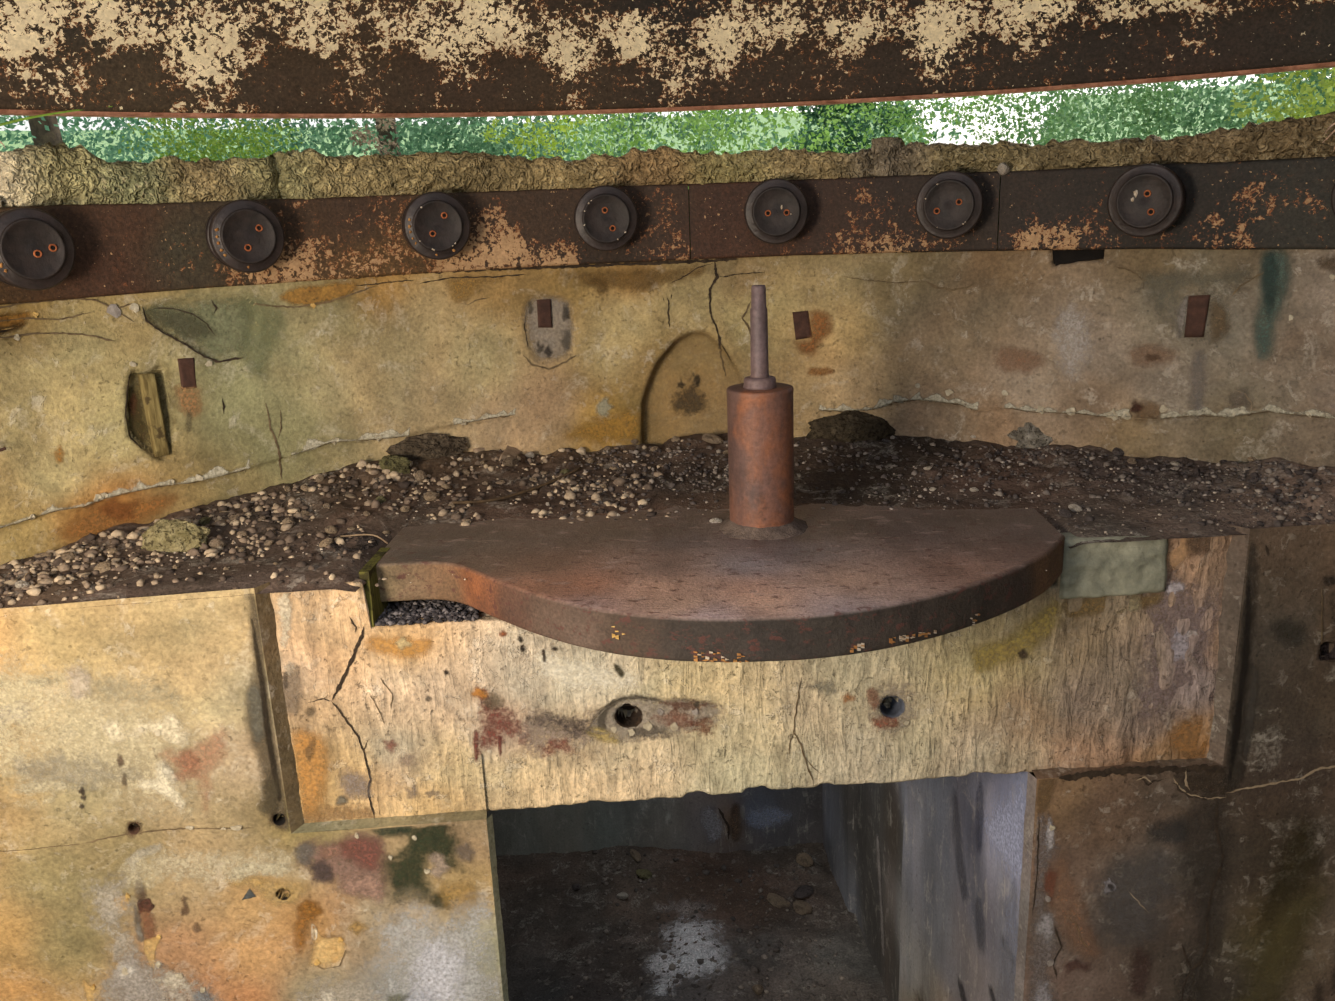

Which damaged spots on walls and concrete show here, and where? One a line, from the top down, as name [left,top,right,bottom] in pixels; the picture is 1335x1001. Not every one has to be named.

crack [316,258,765,376]
corrosion [566,269,703,293]
corrosion [798,312,831,353]
leakage [1255,251,1294,358]
crack [265,403,282,479]
corrosion [368,637,430,657]
crack [308,618,393,818]
corrosion [472,688,528,761]